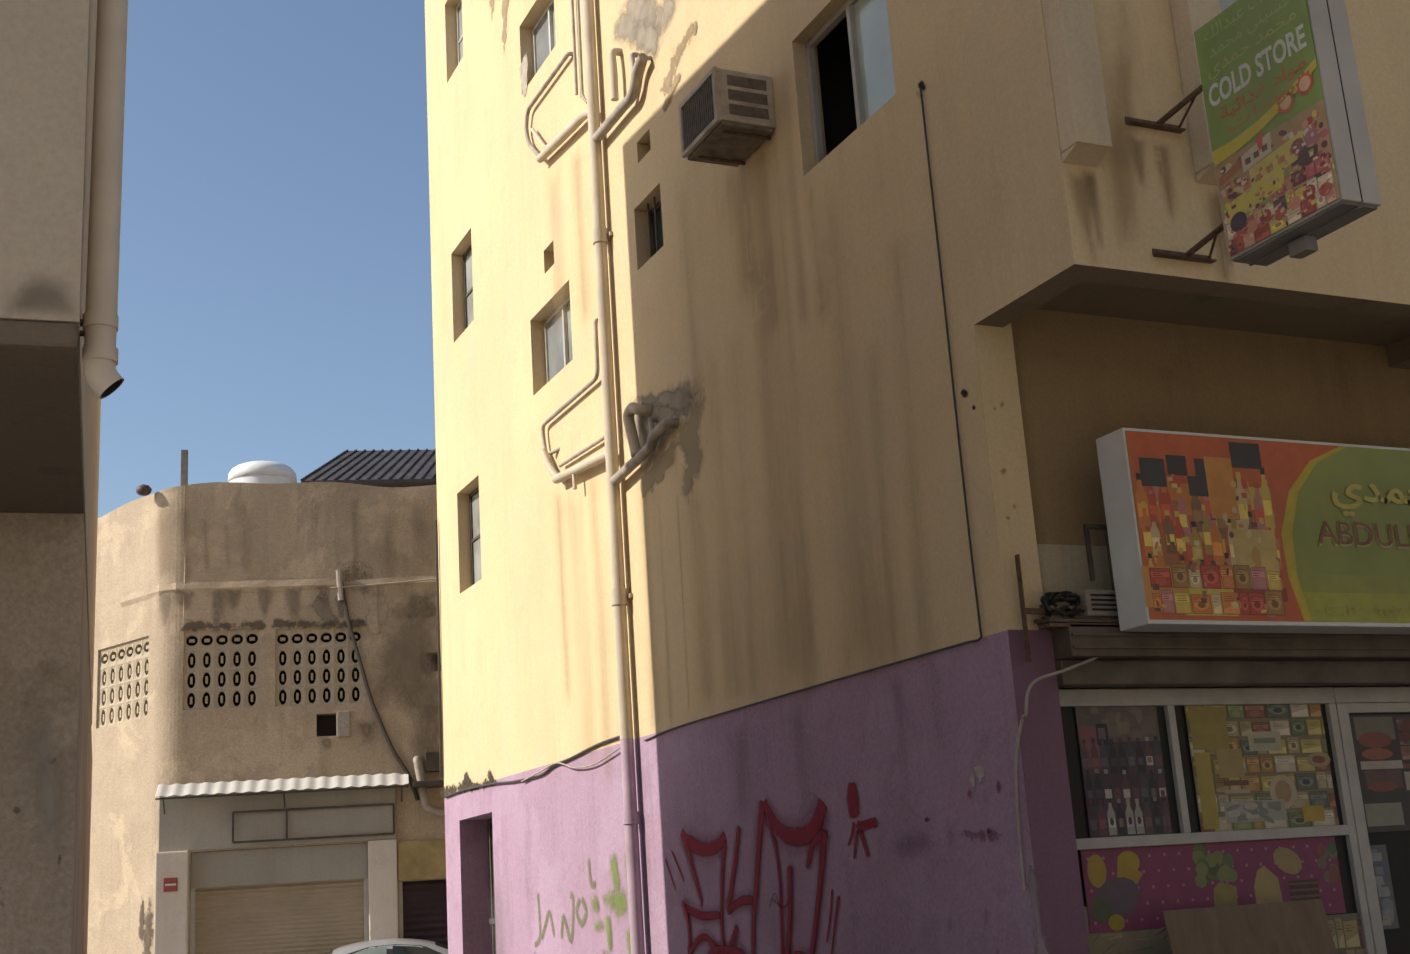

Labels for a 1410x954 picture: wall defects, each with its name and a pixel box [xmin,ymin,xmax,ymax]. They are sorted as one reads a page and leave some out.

peeling [661,21,697,111]
damp [181,590,366,632]
spalling [139,896,154,954]